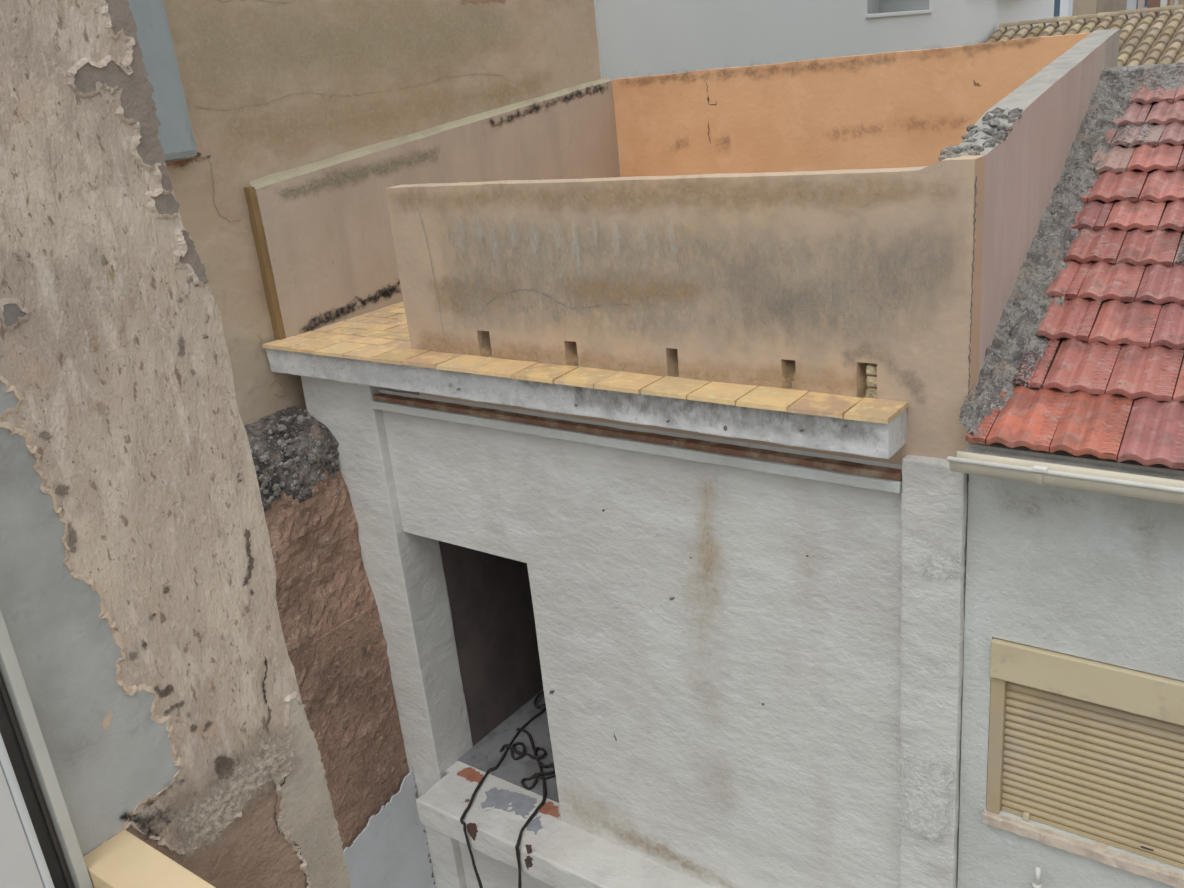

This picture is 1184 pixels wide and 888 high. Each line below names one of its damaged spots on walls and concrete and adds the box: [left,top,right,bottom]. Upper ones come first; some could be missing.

mould [490,85,604,126]
peeling [67,0,209,315]
spalling [938,107,1023,161]
peeling [0,297,31,333]
spalling [0,375,395,888]